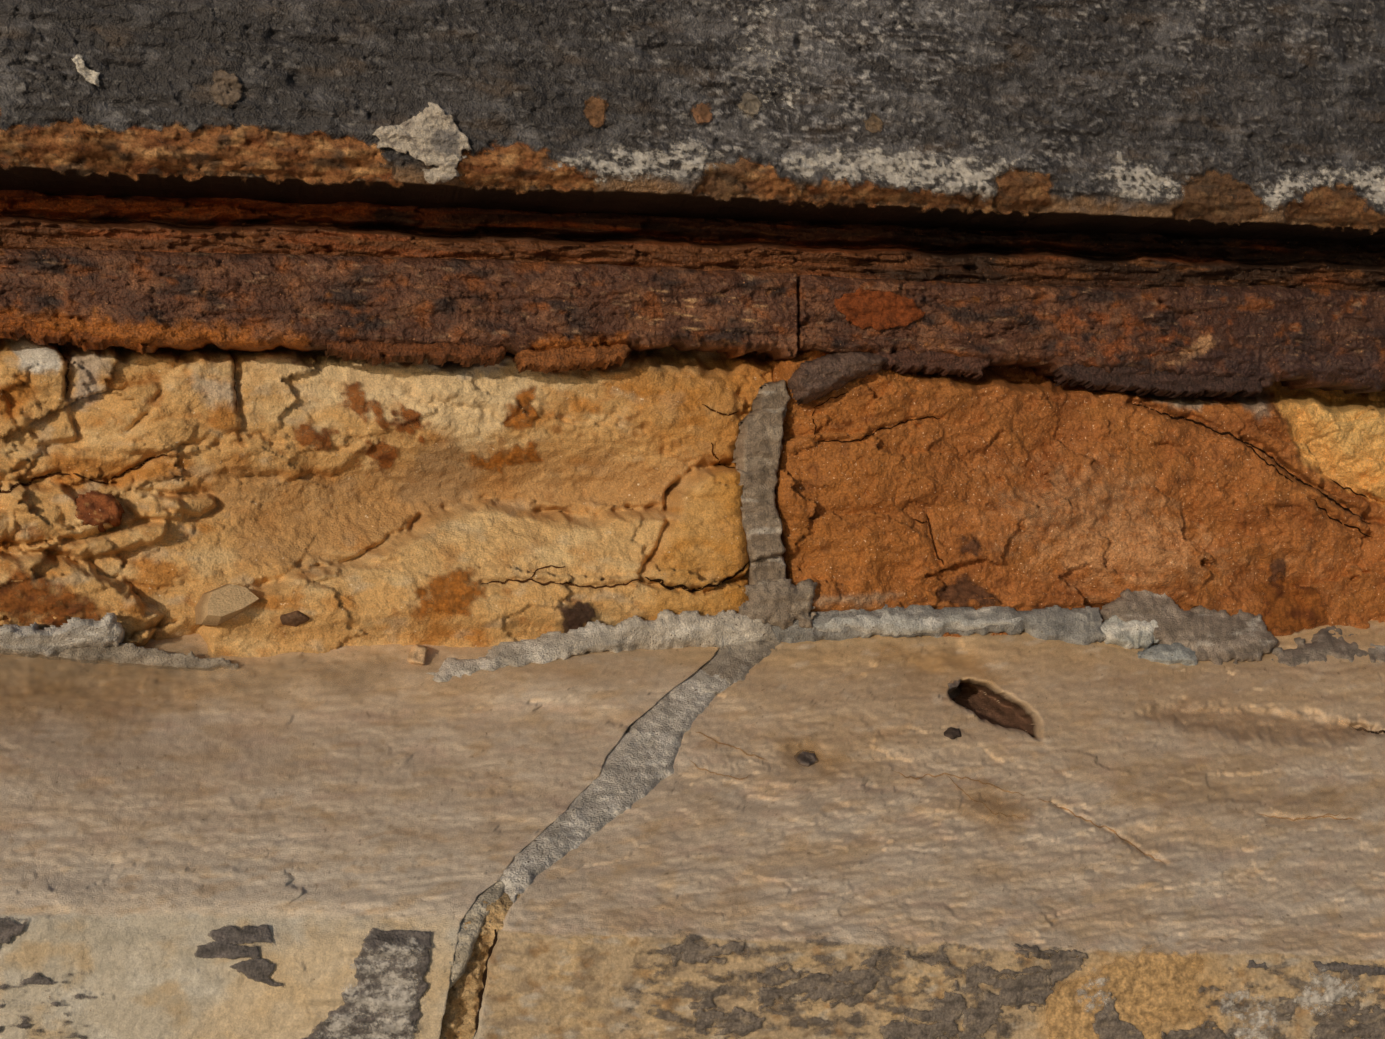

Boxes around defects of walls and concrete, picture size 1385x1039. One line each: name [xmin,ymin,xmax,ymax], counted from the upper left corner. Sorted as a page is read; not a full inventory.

spalling [0,102,596,194]
water stain [551,142,723,182]
water stain [781,147,1020,200]
water stain [1261,168,1385,208]
corrosion [325,340,632,473]
corrosion [787,349,991,405]
corrosion [1254,576,1327,633]
crack [691,732,768,780]
peeling [194,924,284,987]
peeling [302,928,432,1039]
crack [473,929,498,1039]
spalling [620,934,1385,1039]